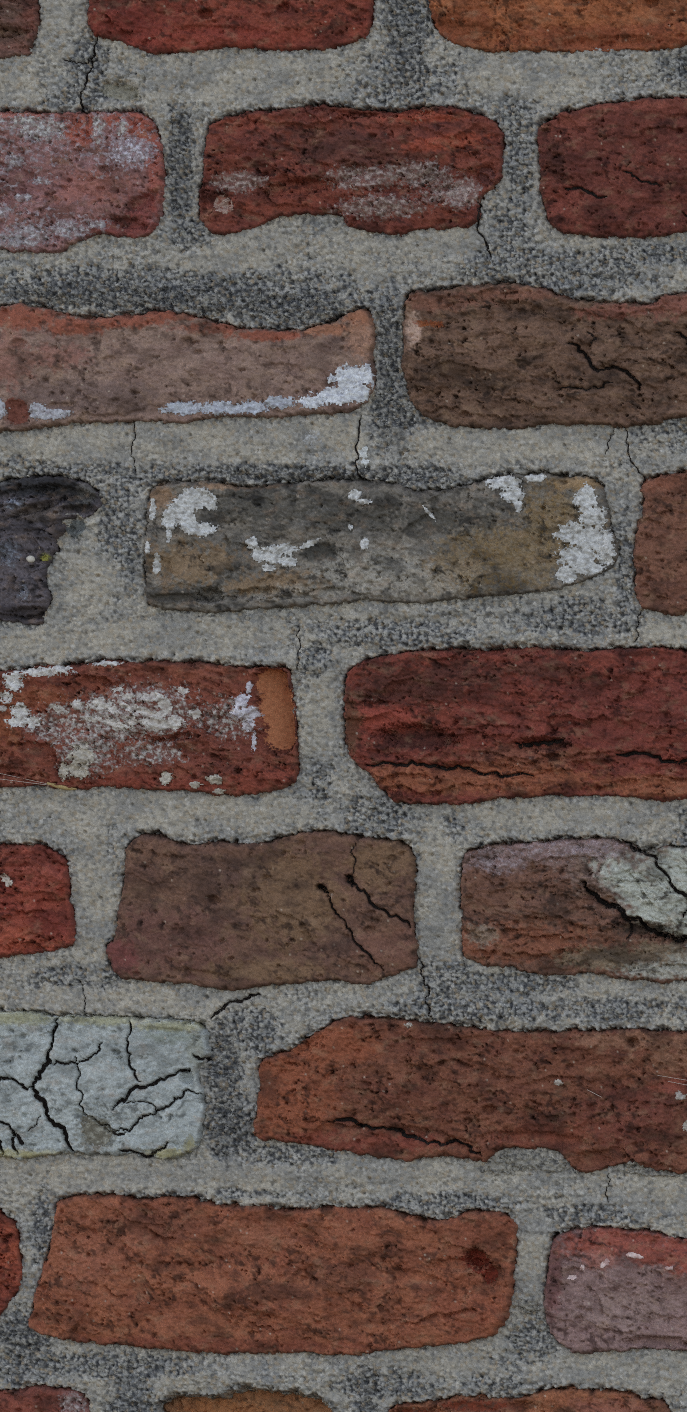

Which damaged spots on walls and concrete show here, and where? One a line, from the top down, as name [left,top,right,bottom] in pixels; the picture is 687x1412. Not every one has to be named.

damp [0,659,263,795]
crack [584,840,687,943]
crack [0,981,212,1158]